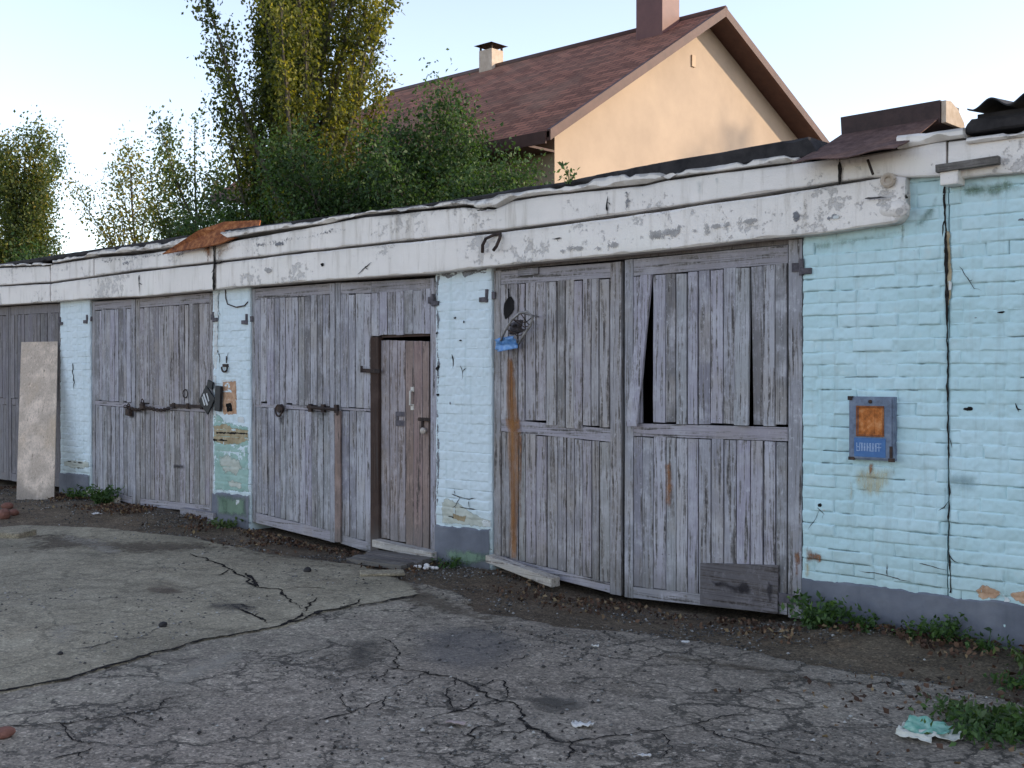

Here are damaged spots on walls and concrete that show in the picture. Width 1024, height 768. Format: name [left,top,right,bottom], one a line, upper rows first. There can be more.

peeling [560,242,618,253]
peeling [649,219,757,239]
peeling [213,379,249,505]
peeling [435,268,491,527]
corrosion [506,359,522,548]
crack [861,186,982,593]
crack [0,553,419,691]
peeling [976,585,1024,604]
crack [363,664,532,744]